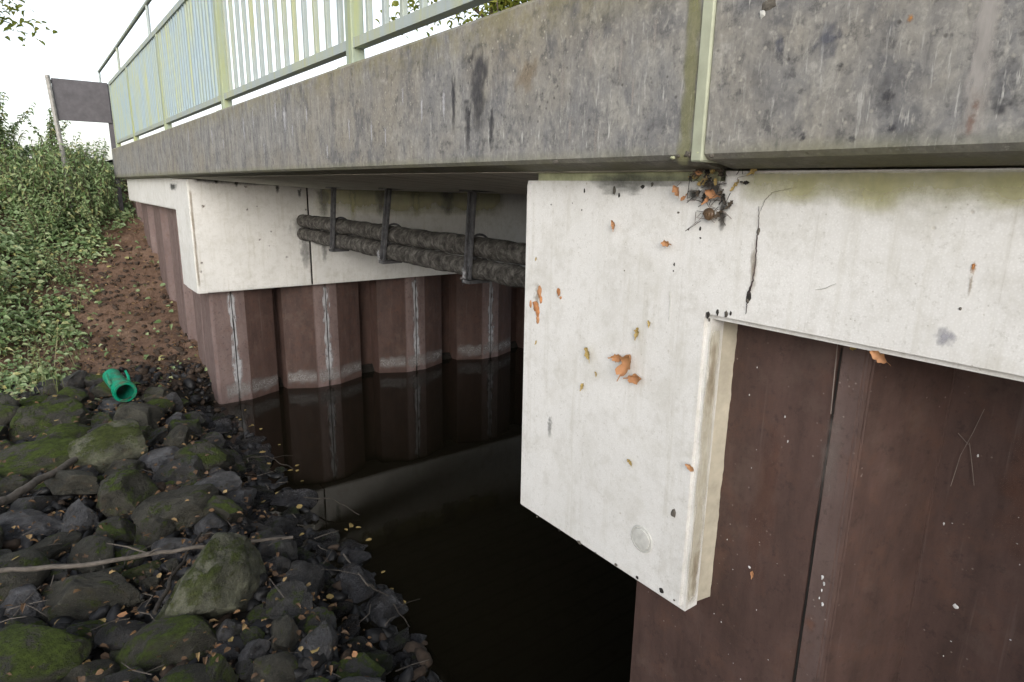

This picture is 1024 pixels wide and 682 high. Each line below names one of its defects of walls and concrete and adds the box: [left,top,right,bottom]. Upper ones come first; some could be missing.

damp [442,55,493,141]
crack [746,187,796,313]
damp [228,292,276,399]
damp [289,284,361,381]